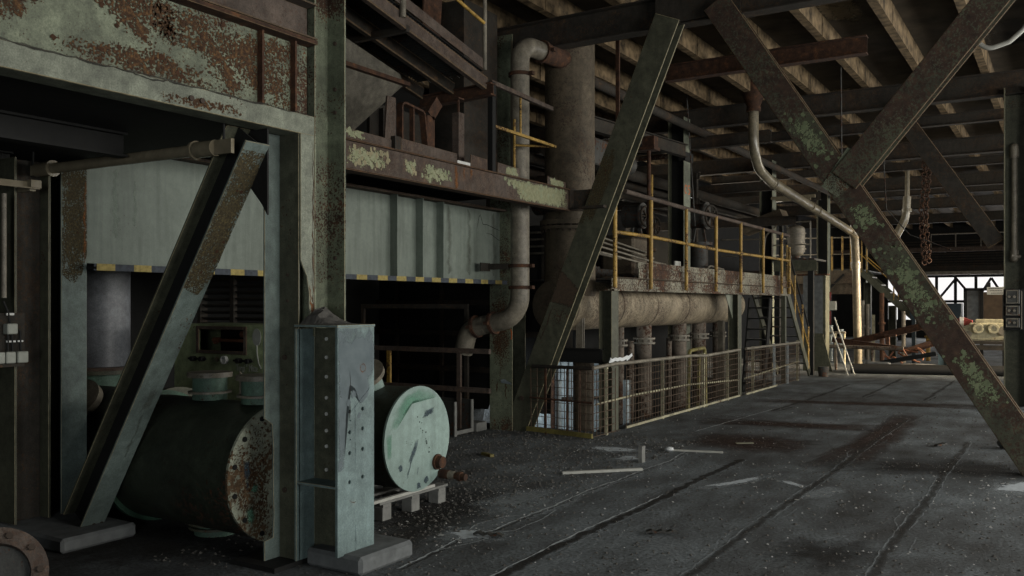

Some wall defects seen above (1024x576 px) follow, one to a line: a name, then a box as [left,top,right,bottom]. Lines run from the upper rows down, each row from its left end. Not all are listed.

corrosion [50,0,302,116]
corrosion [62,170,87,283]
corrosion [184,149,265,295]
peeling [346,126,390,171]
peeling [405,159,452,185]
peeling [504,167,567,208]
crack [397,378,903,576]
crack [680,381,954,576]
crack [865,442,972,576]